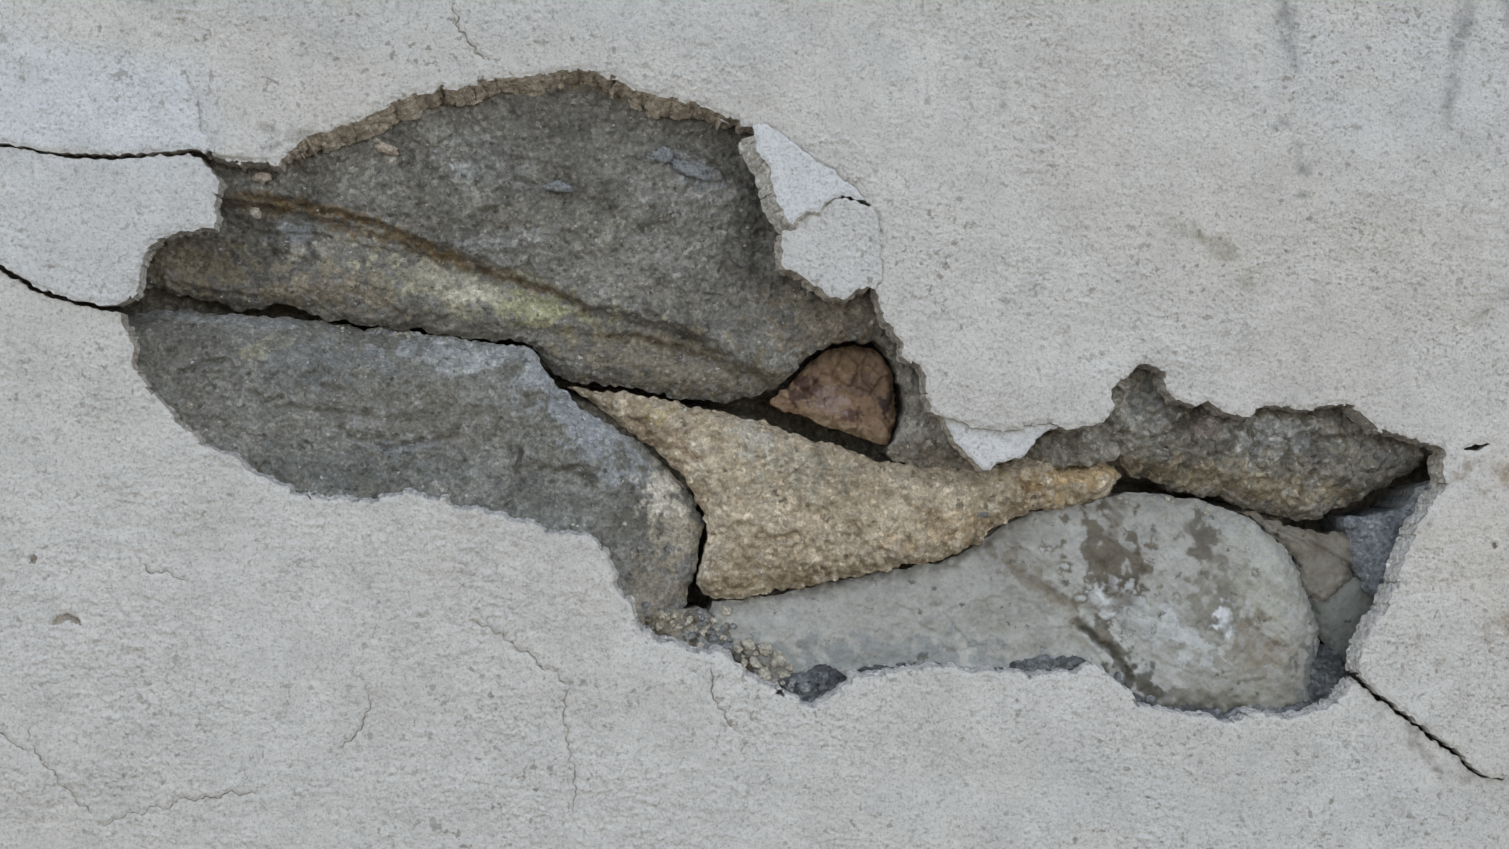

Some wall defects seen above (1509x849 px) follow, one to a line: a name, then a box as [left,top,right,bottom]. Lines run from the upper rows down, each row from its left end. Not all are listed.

crack [0,145,207,160]
crack [0,265,122,312]
spalling [0,68,1353,603]
crack [1464,443,1484,451]
spalling [116,308,1508,781]
spalling [52,613,81,626]
crack [1349,672,1502,780]